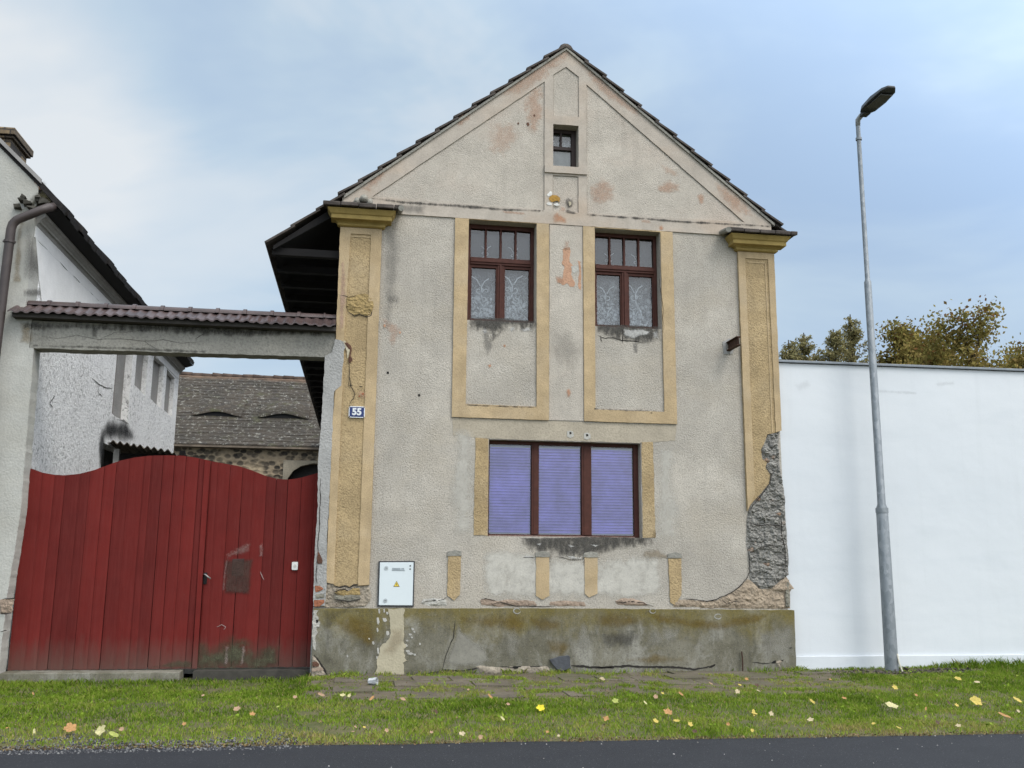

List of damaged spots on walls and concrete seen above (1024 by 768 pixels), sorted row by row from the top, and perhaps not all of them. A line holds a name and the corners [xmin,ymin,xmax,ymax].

peeling [557,247,581,290]
leakage [472,317,535,332]
leakage [598,325,658,341]
spalling [673,432,794,609]
leakage [525,536,647,559]
spalling [311,552,389,676]
crack [410,625,716,675]